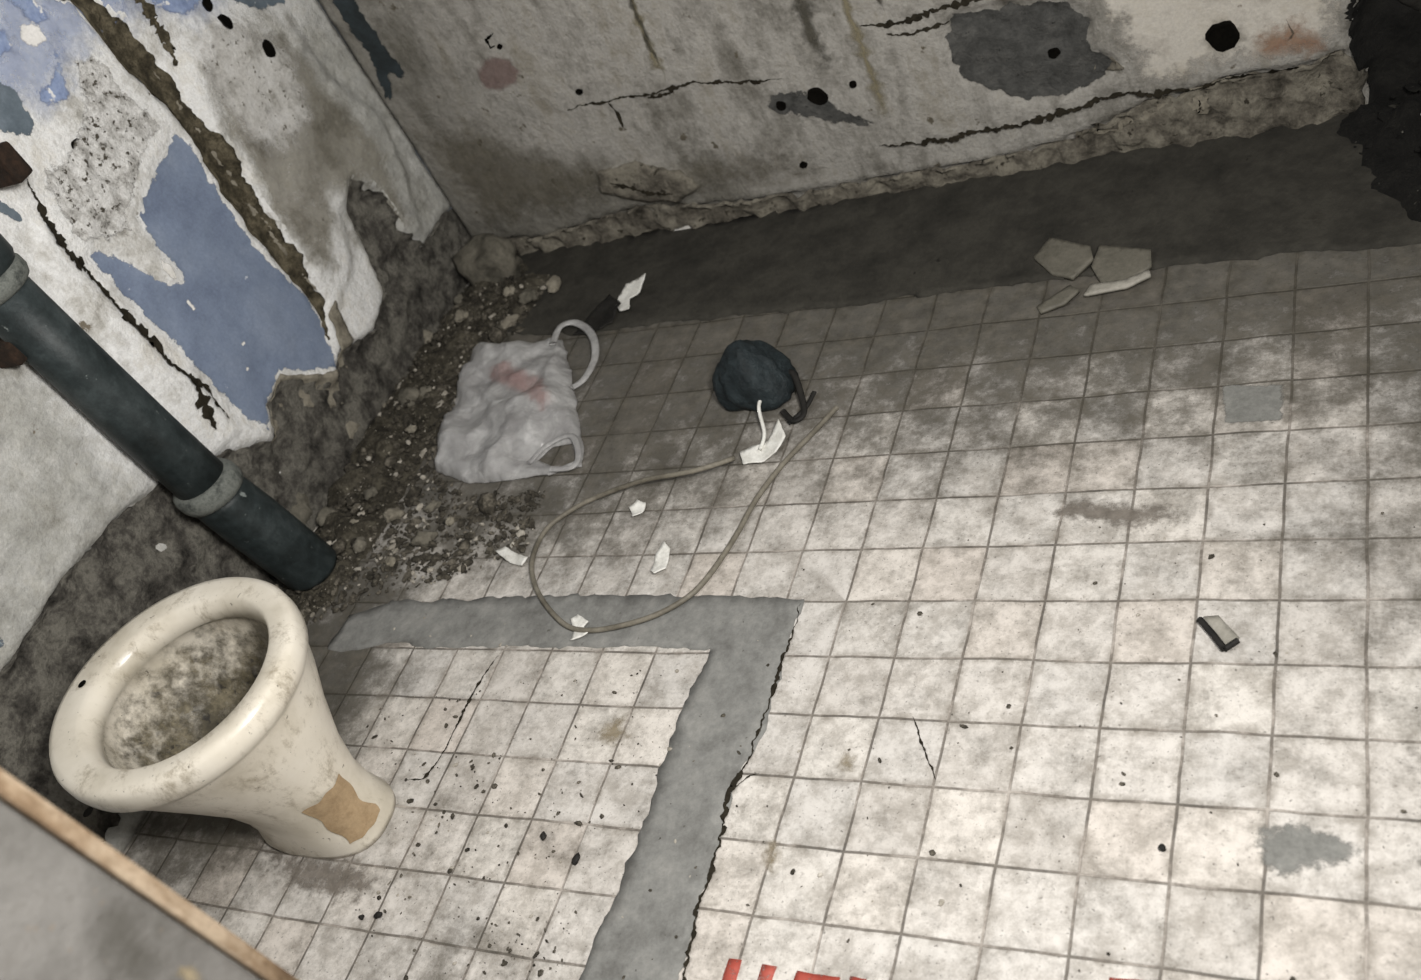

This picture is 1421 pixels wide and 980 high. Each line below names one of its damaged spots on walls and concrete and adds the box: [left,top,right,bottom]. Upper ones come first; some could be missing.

crack [567,78,782,127]
crack [859,0,980,36]
spalling [509,0,1421,256]
crack [26,178,229,429]
peeling [0,0,471,531]
spalling [1034,237,1152,298]
spalling [0,483,284,842]
crack [682,603,801,980]
leakage [1258,824,1352,875]